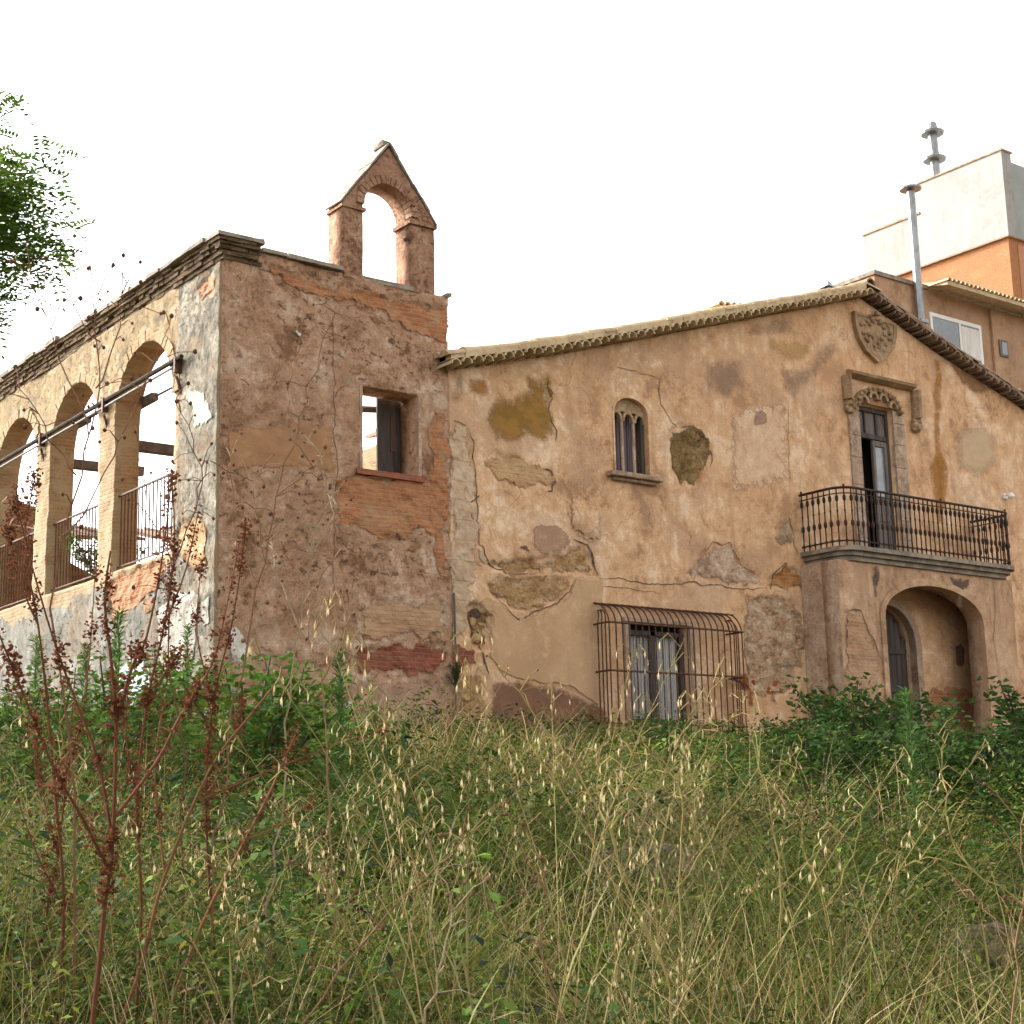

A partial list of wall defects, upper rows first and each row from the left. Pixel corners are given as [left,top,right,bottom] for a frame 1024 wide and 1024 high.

flaking render [184,388,211,428]
crack [616,366,679,428]
flaking render [670,426,713,485]
flaking render [335,407,598,728]
crack [604,577,757,594]
peeling [107,559,210,694]
flaking render [689,541,804,698]
flaking render [845,608,881,729]
leakage [492,683,608,743]